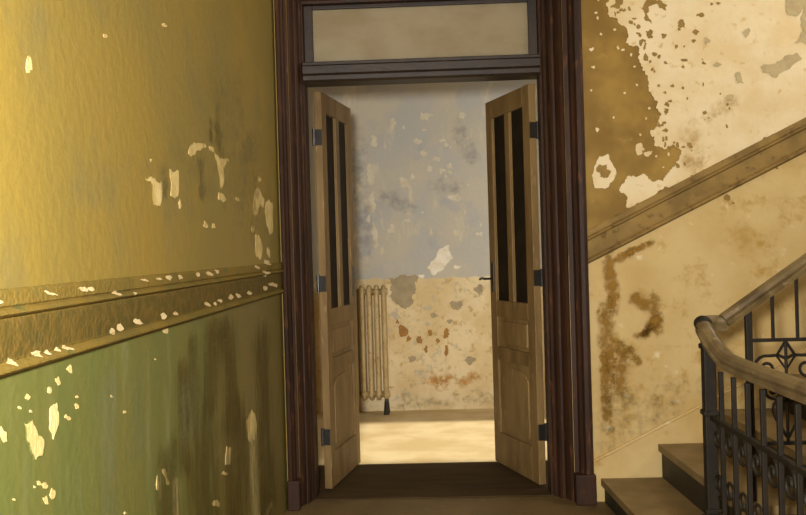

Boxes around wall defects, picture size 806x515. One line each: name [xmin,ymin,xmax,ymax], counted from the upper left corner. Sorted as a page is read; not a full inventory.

peeling [591,0,806,209]
peeling [145,169,182,209]
peeling [188,143,230,202]
peeling [418,245,461,278]
peeling [31,345,74,357]
flaking render [396,319,453,359]
peeling [17,394,71,461]
damp [228,346,274,515]
peeling [246,409,257,444]
peeling [222,446,231,475]
peeling [33,481,56,504]